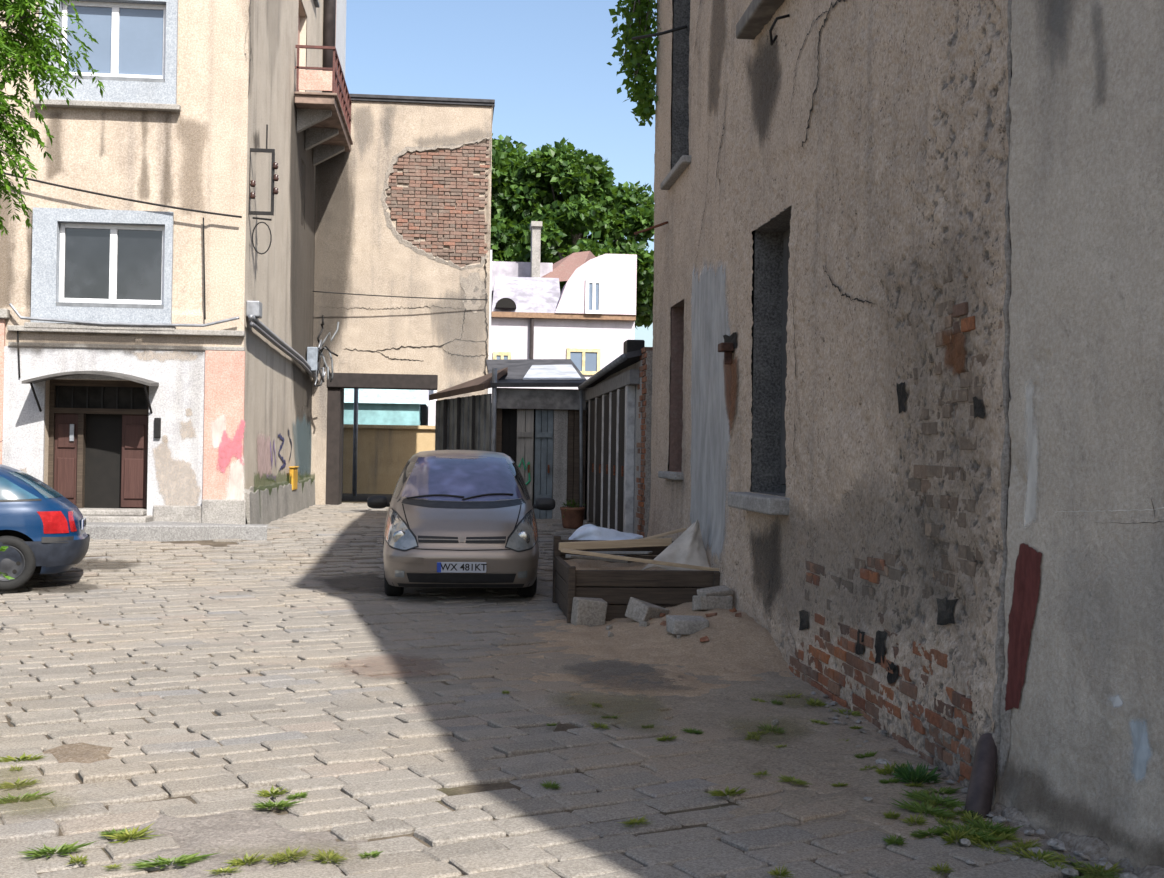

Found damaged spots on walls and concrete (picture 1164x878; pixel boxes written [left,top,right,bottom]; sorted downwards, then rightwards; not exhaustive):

flaking render [380,136,491,313]
crack [346,259,488,375]
peeling [907,269,1003,450]
peeling [211,416,226,448]
peeling [226,457,244,500]
flaking render [789,450,1001,787]
spalling [996,683,1011,778]